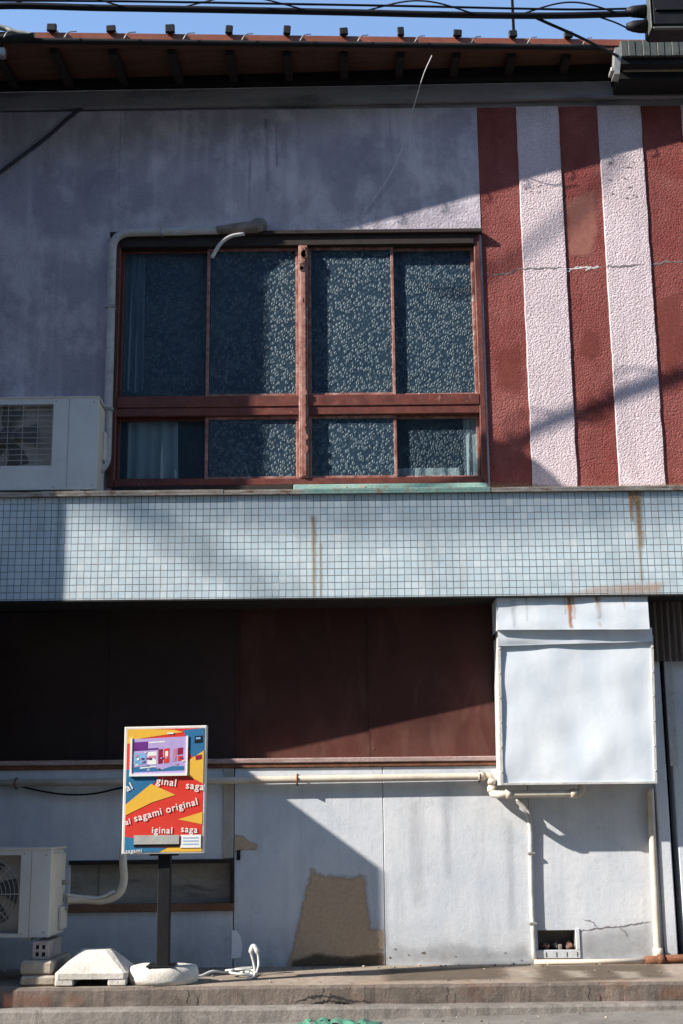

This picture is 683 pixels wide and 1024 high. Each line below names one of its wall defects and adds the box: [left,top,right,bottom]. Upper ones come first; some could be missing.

crack [492,260,683,276]
rust [629,492,641,543]
flaking render [288,869,425,967]
crack [582,919,647,939]